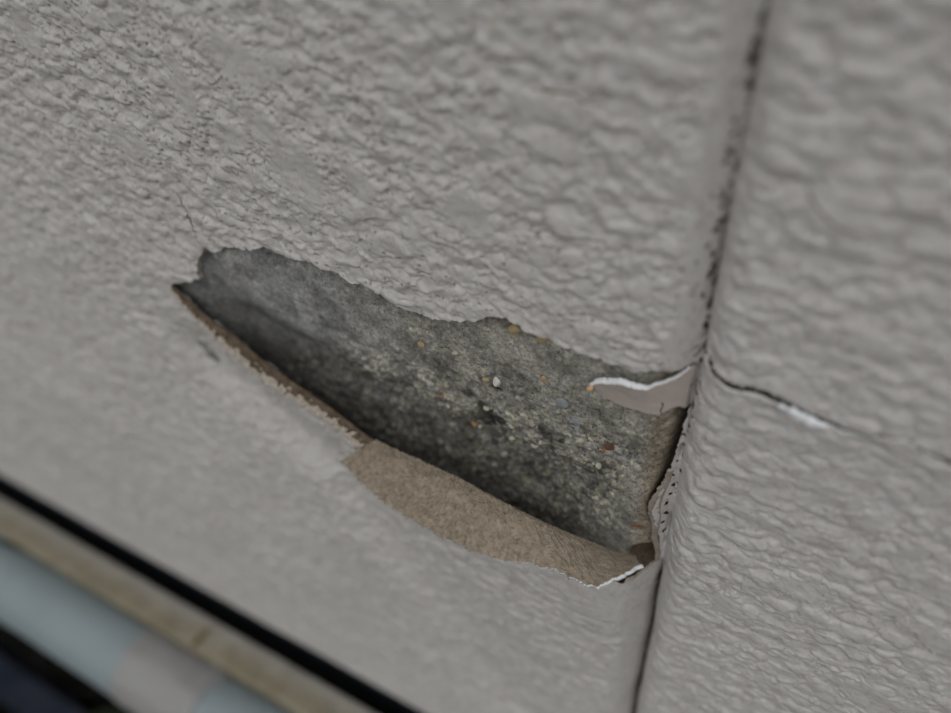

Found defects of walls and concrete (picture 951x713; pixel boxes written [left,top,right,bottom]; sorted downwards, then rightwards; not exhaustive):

peeling [170,247,694,590]
crack [683,337,951,465]